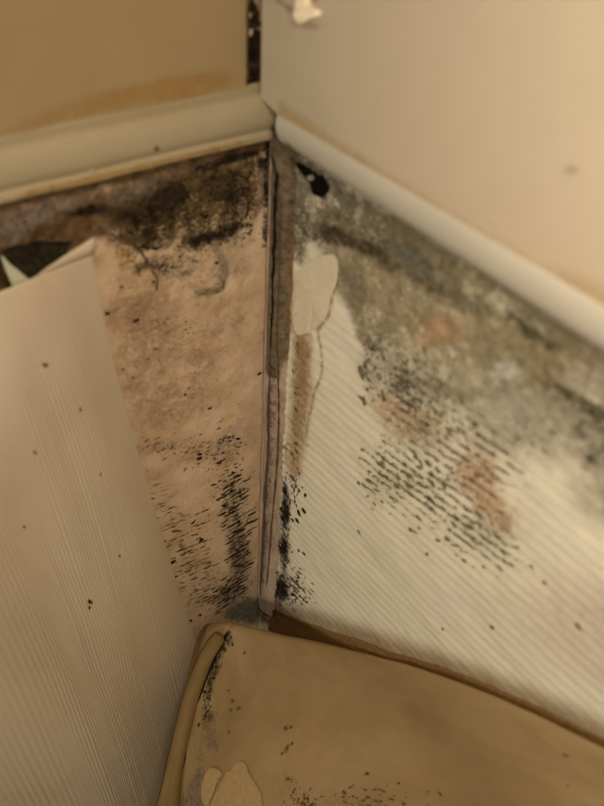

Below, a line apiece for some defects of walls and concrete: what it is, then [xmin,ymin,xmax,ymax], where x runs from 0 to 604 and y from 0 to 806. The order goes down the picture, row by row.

spalling [295,161,330,200]
peeling [292,254,338,335]
flaking render [201,761,262,806]
water stain [283,777,323,806]